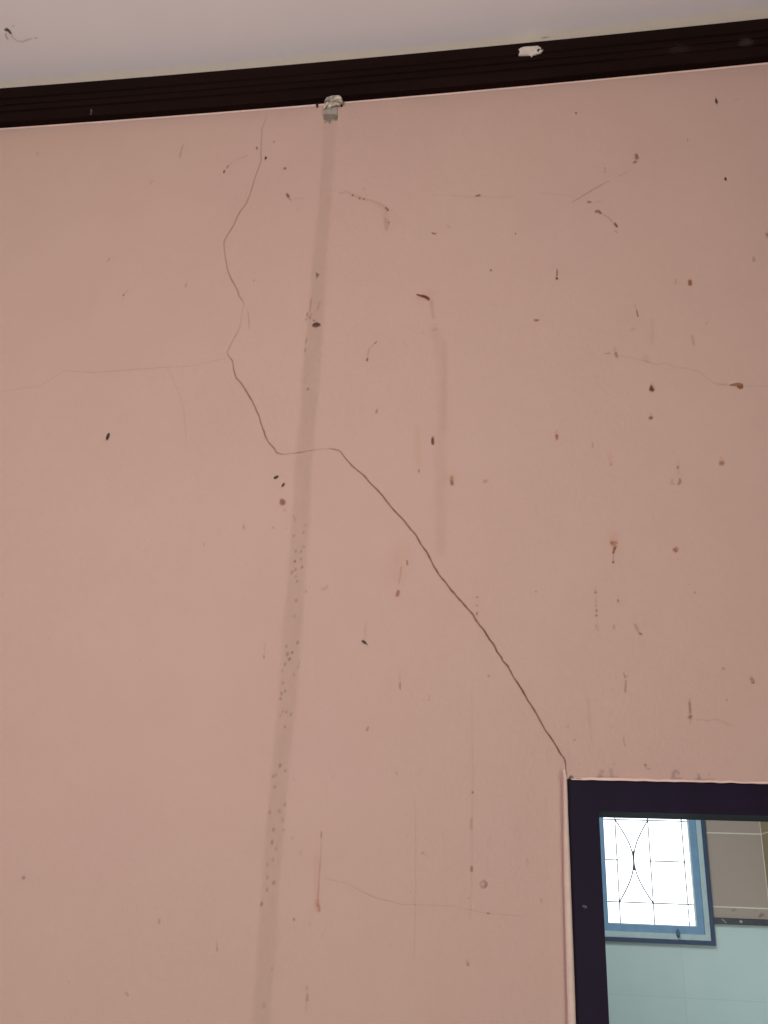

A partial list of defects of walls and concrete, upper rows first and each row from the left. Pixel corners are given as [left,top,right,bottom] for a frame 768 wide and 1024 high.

crack [351,465,566,764]